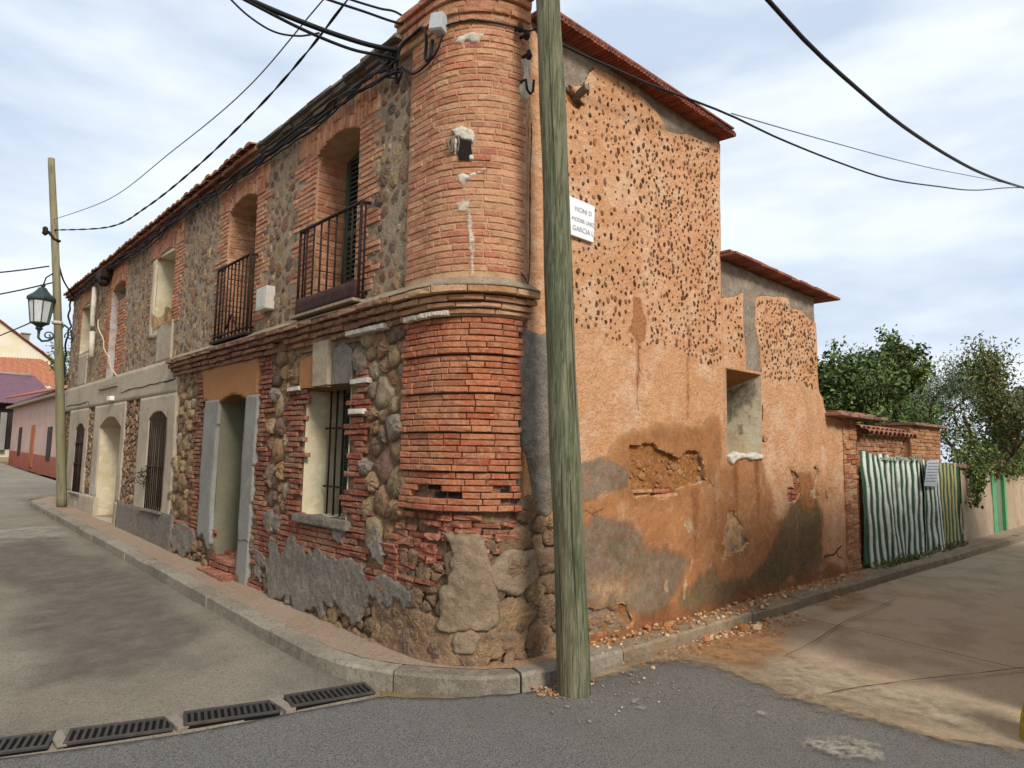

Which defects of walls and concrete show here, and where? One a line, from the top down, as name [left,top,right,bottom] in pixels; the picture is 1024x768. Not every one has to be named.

spalling [447,126,475,161]
leakage [458,201,474,273]
spalling [428,484,463,499]
flaking render [628,443,707,498]
flaking render [787,466,830,502]
leakage [581,414,846,642]